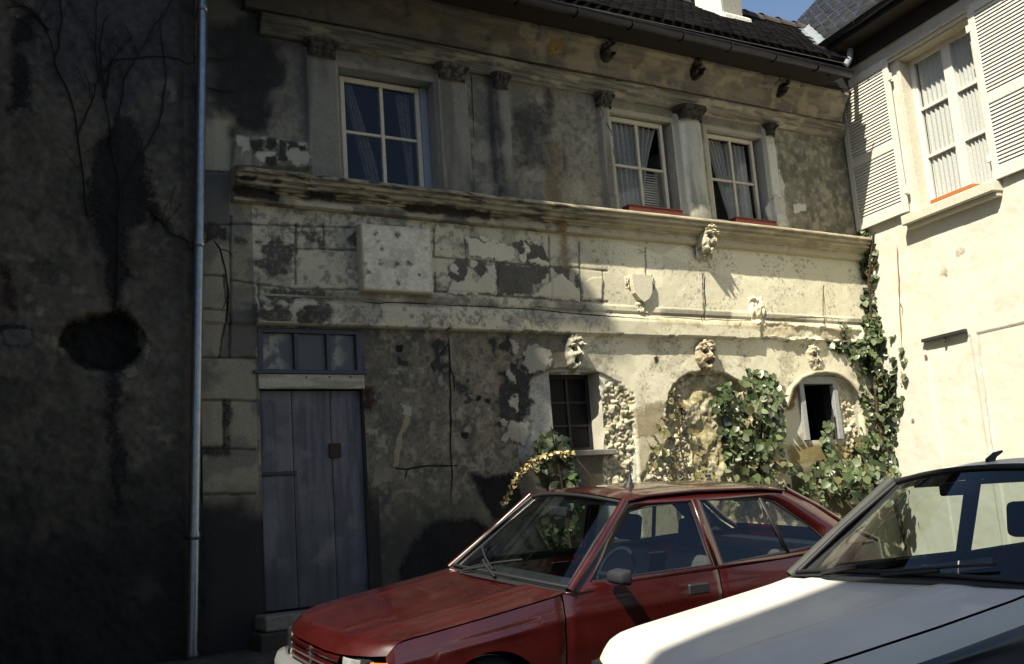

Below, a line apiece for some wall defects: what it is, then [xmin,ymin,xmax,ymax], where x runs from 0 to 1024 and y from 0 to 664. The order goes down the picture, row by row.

peeling [234,134,312,169]
peeling [447,236,603,302]
crack [393,337,464,510]
peeling [497,339,553,447]